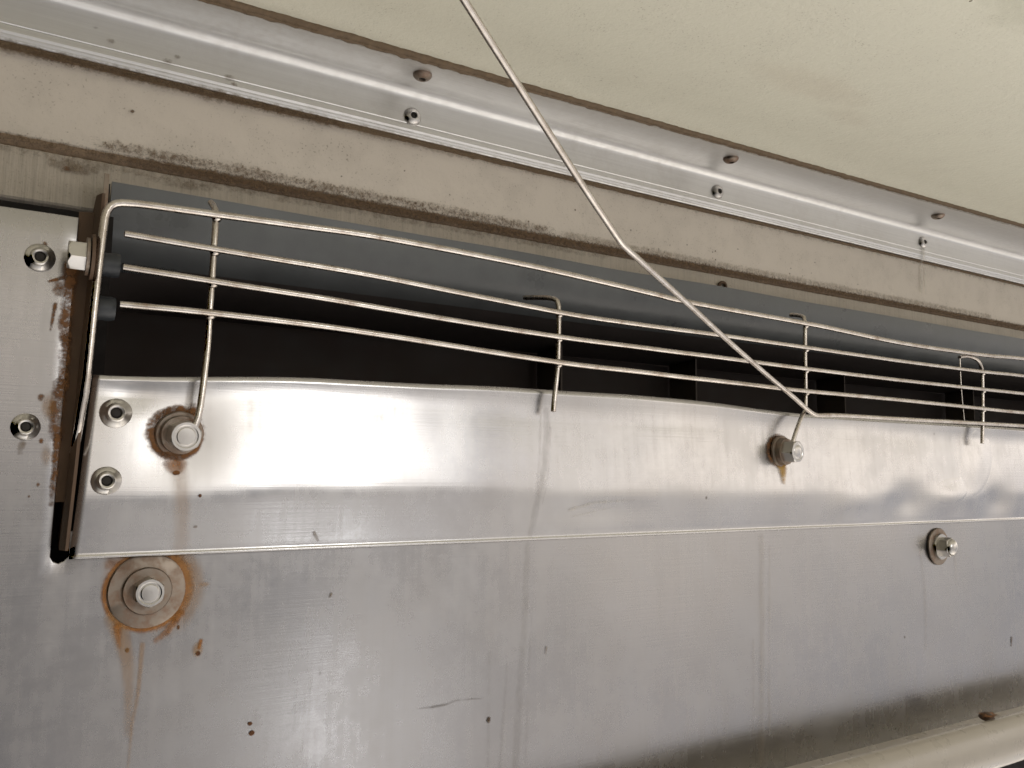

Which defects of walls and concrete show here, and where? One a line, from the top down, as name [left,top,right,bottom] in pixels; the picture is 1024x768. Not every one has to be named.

water stain [85,140,1024,329]
corrosion [37,262,79,505]
corrosion [146,405,204,475]
corrosion [767,434,786,481]
corrosion [102,555,193,636]